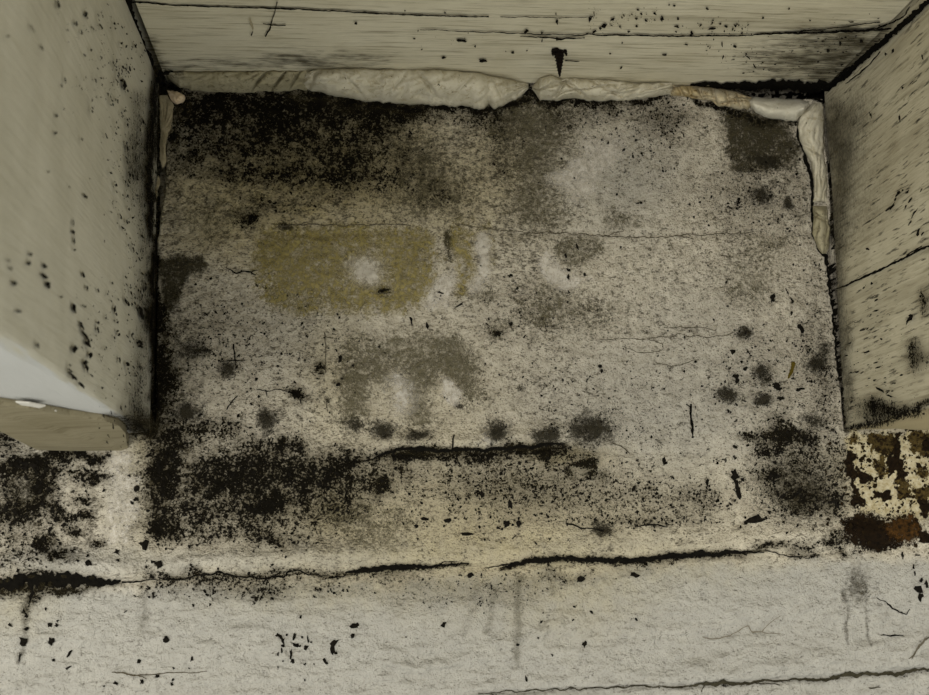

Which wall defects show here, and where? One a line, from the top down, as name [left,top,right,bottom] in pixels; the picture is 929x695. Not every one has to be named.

water stain [66,12,929,607]
water stain [0,433,114,573]
crack [0,548,810,604]
crack [362,434,565,462]
peeling [809,420,929,559]
corrosion [838,509,920,554]